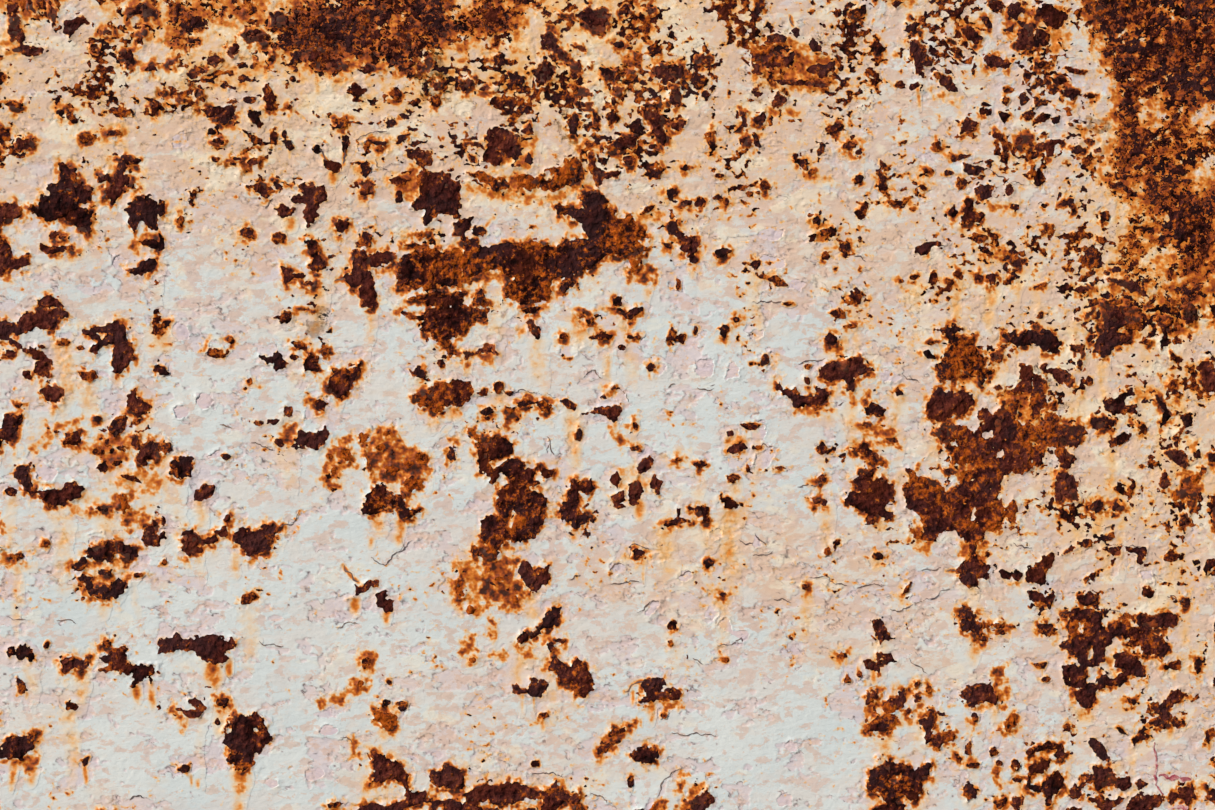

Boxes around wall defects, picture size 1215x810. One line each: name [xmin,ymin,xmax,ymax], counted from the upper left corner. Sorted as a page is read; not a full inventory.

corrosion [207,209,266,284]
corrosion [778,299,797,308]
corrosion [551,324,569,344]
corrosion [181,329,254,376]
corrosion [237,374,266,396]
corrosion [652,386,698,441]
corrosion [217,443,248,474]
corrosion [11,675,28,700]
corrosion [161,760,201,792]